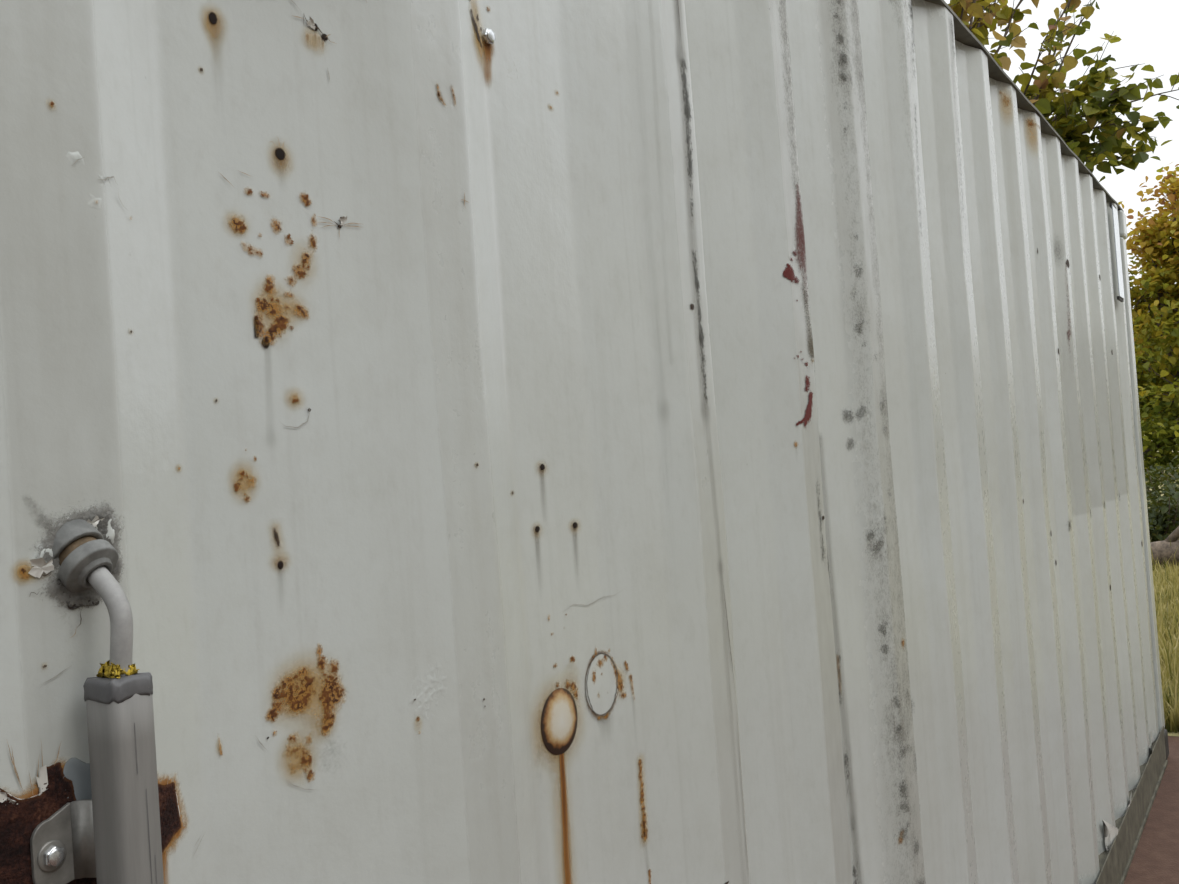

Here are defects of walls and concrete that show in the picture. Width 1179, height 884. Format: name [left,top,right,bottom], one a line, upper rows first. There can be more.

corrosion [470,0,493,80]
corrosion [230,217,263,256]
corrosion [254,193,317,348]
peeling [782,184,815,426]
corrosion [234,471,256,502]
peeling [28,558,54,578]
corrosion [592,649,635,699]
corrosion [258,645,344,790]
corrosion [559,753,572,884]